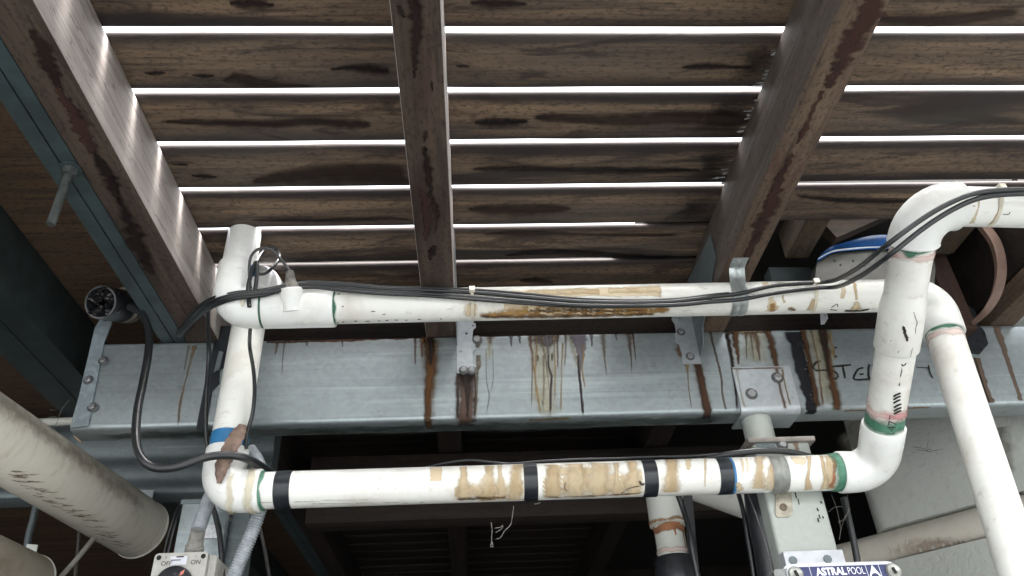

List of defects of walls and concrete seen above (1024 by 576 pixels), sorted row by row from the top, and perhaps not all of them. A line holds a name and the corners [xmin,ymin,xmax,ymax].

leakage [30,30,63,91]
leakage [93,153,154,274]
leakage [799,195,908,204]
rust [267,337,443,428]
rust [455,336,494,426]
rust [677,344,712,418]
rust [800,329,865,411]